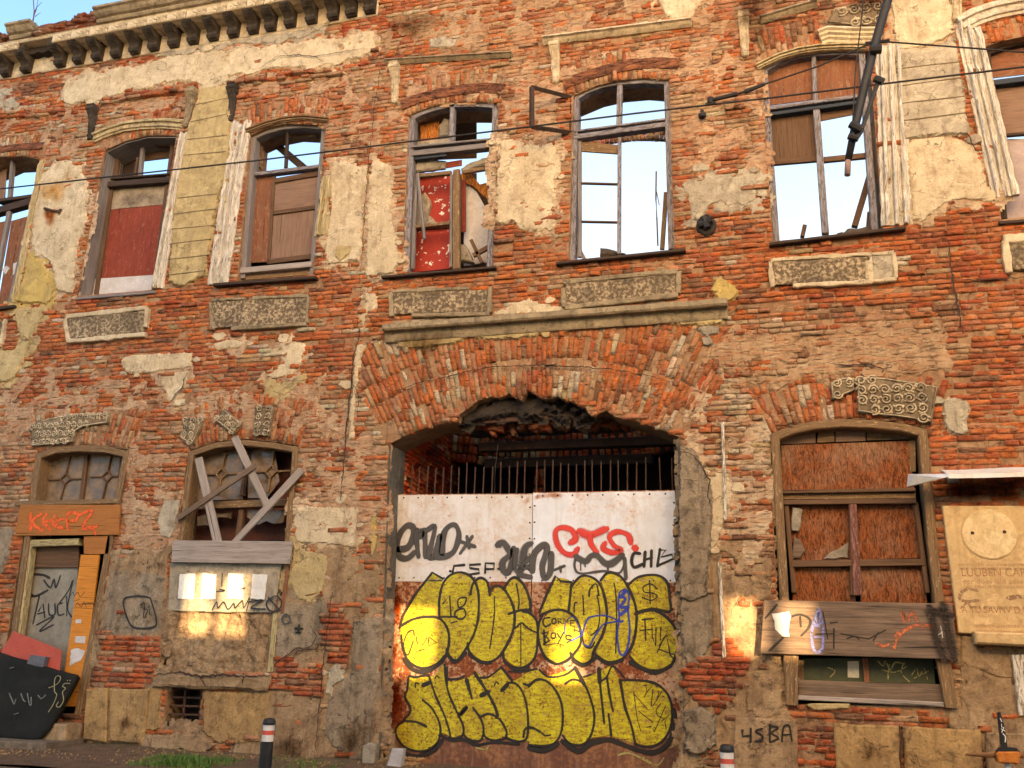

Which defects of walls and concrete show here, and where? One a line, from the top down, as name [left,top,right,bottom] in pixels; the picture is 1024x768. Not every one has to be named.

flaking render [0,158,100,389]
flaking render [121,333,255,411]
flaking render [56,23,383,288]
crack [340,317,360,500]
flaking render [318,152,410,440]
flaking render [481,132,575,241]
spalling [457,395,604,434]
flaking render [670,164,776,231]
flaking render [882,0,1015,228]
flaking render [87,494,396,761]
flaking render [672,468,850,768]